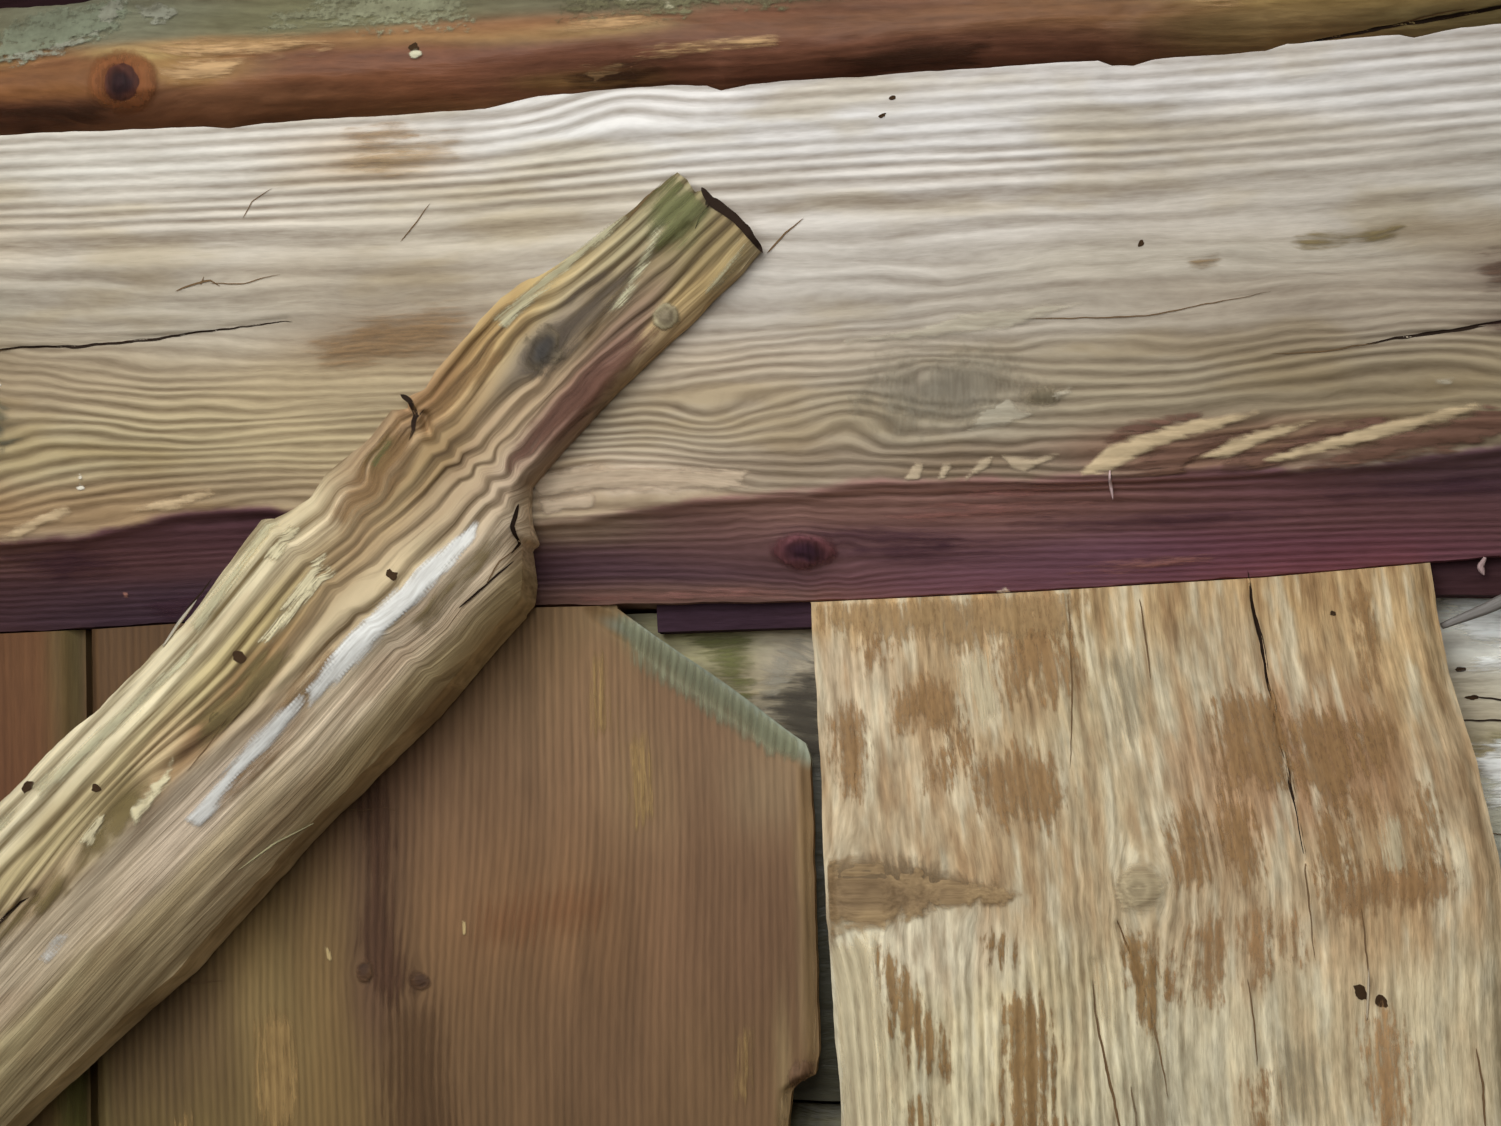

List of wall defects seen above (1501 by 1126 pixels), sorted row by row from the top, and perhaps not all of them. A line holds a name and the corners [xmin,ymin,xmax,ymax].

crack [177,274,280,291]
crack [1029,291,1270,319]
crack [0,321,291,351]
crack [1275,320,1501,354]
crack [1248,573,1315,956]
crack [0,898,28,924]